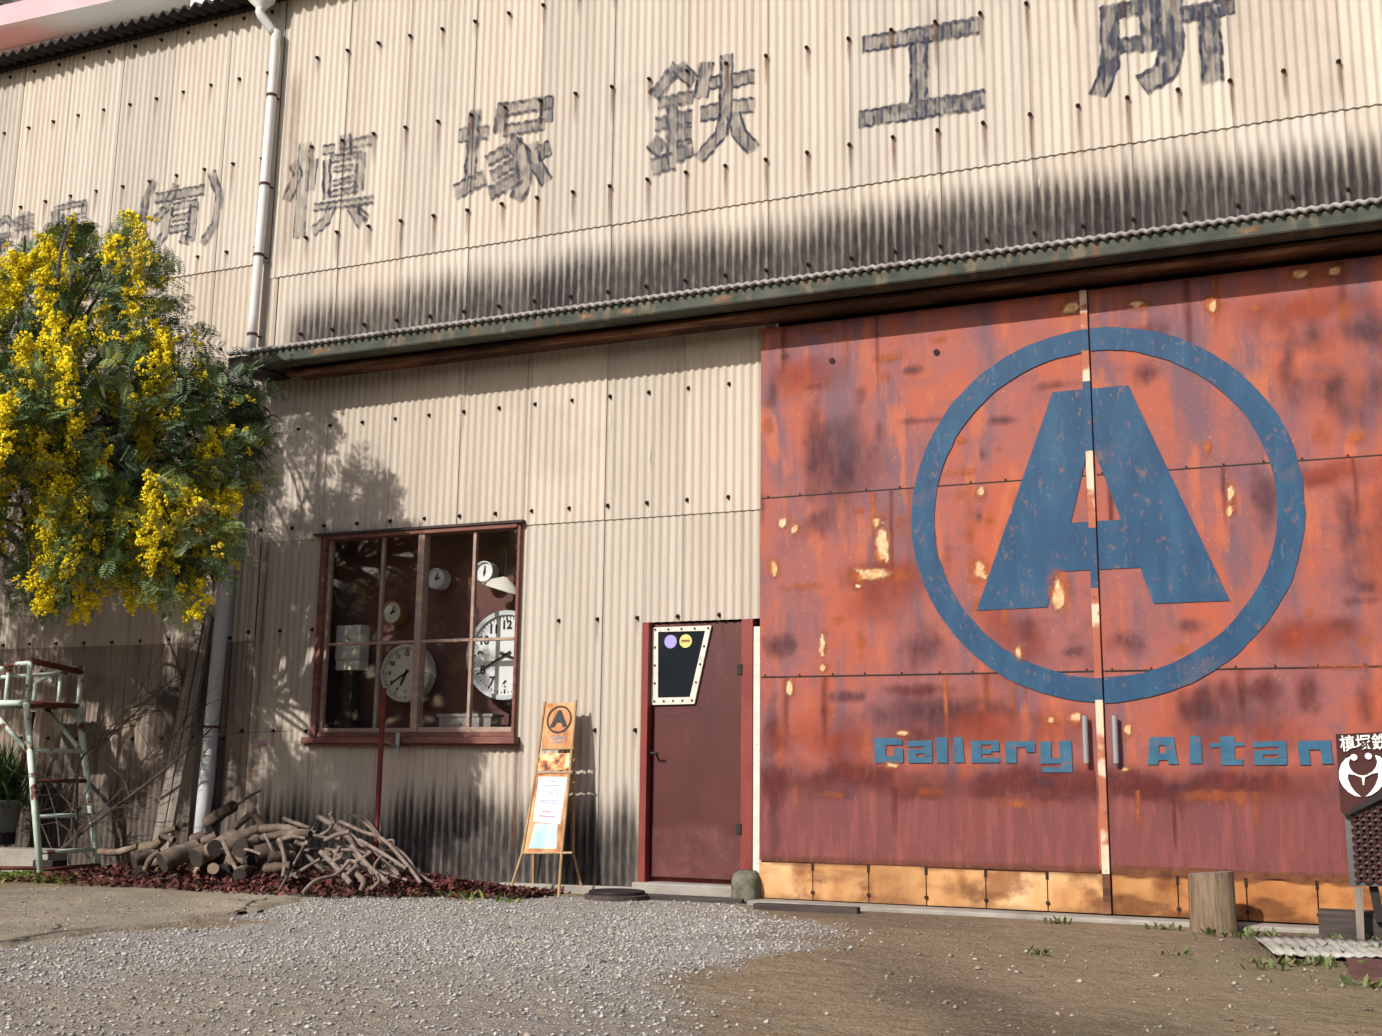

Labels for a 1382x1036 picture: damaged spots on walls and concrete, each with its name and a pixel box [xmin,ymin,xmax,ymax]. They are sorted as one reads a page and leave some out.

water stain [291,146,1382,343]
peeling [854,516,902,588]
peeling [1050,580,1067,609]
water stain [0,774,157,866]
water stain [216,790,637,887]